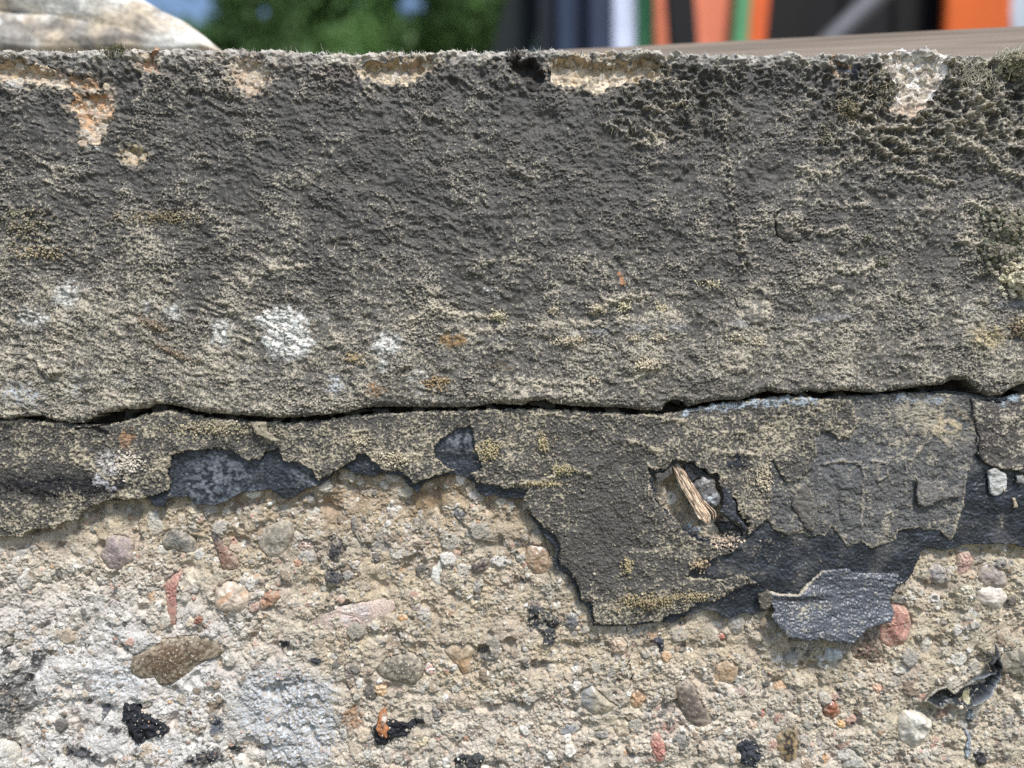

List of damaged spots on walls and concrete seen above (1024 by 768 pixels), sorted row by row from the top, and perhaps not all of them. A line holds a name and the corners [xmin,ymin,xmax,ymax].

spalling [0,58,116,148]
spalling [356,52,434,87]
spalling [500,49,667,95]
spalling [875,46,953,119]
crack [0,380,1024,444]
peeling [0,390,1024,645]
peeling [922,644,1003,710]